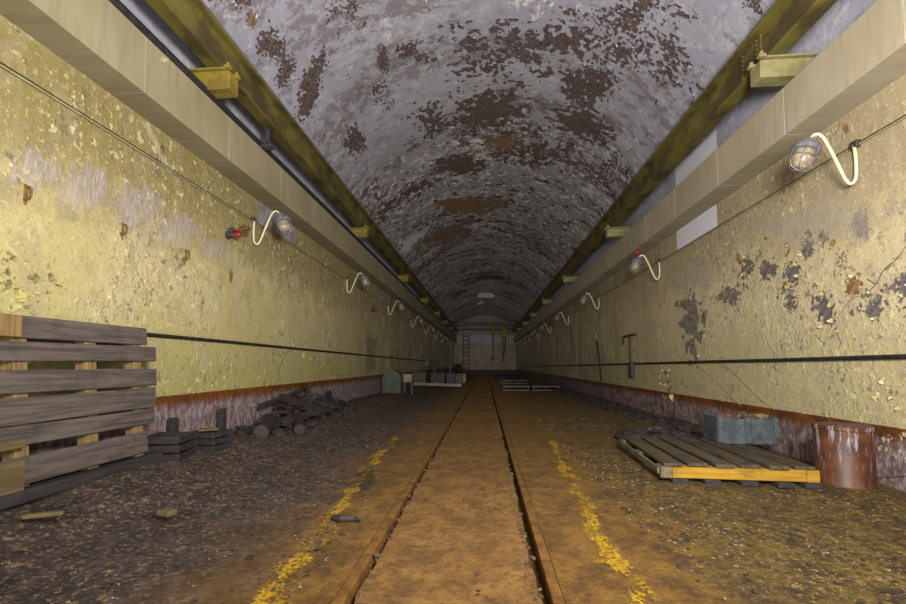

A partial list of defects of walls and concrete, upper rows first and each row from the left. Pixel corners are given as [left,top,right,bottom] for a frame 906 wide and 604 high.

water stain [398,228,430,257]
peeling [0,251,64,313]
spalling [674,205,906,367]
peeling [868,374,906,410]
peeling [877,432,906,460]